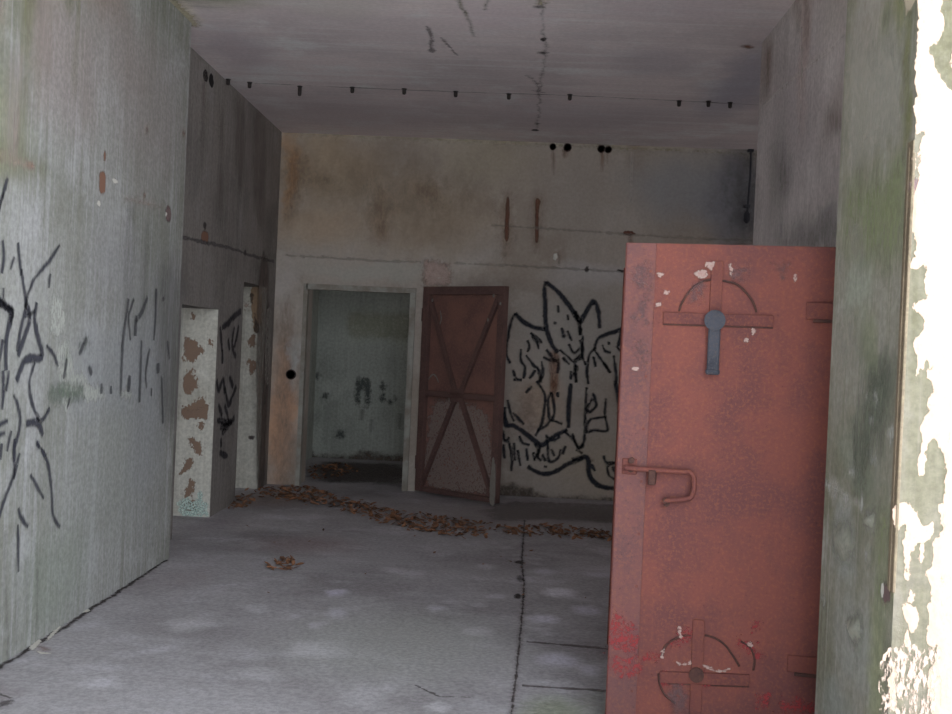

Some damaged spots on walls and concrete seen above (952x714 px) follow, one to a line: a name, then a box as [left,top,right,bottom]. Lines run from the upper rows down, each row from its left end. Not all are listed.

crack [426,26,456,54]
peeling [179,337,213,511]
peeling [878,0,952,714]